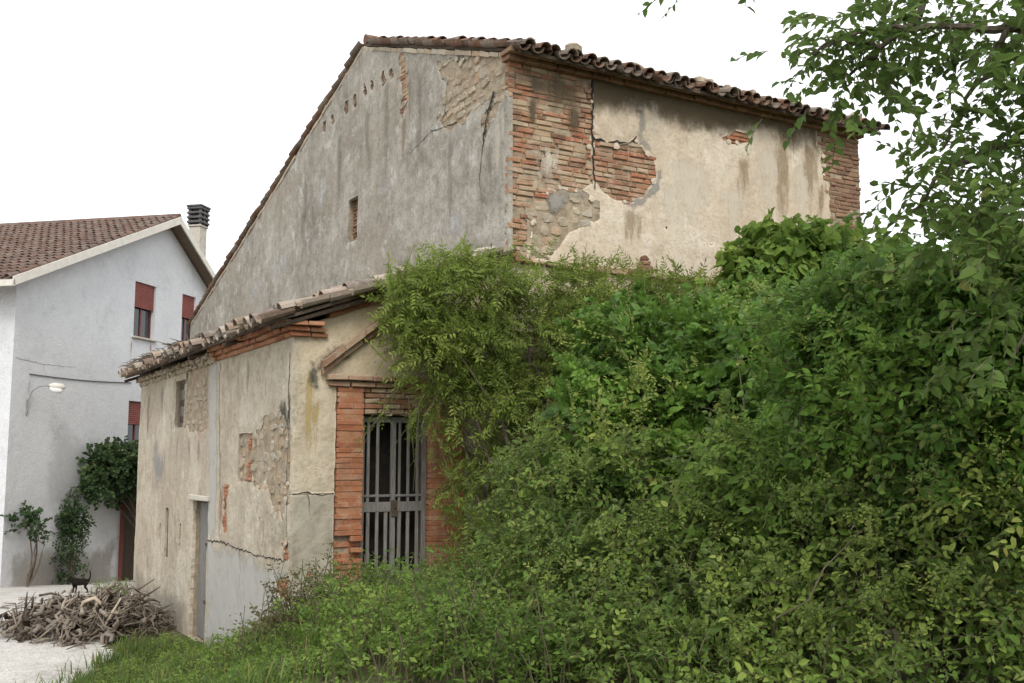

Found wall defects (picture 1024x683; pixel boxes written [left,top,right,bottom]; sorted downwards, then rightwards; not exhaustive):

crack [479,91,495,193]
spalling [435,50,657,266]
crack [591,79,637,189]
leakage [591,80,818,209]
spalling [722,131,749,145]
spalling [183,366,209,439]
crack [208,363,334,562]
spalling [246,410,298,520]